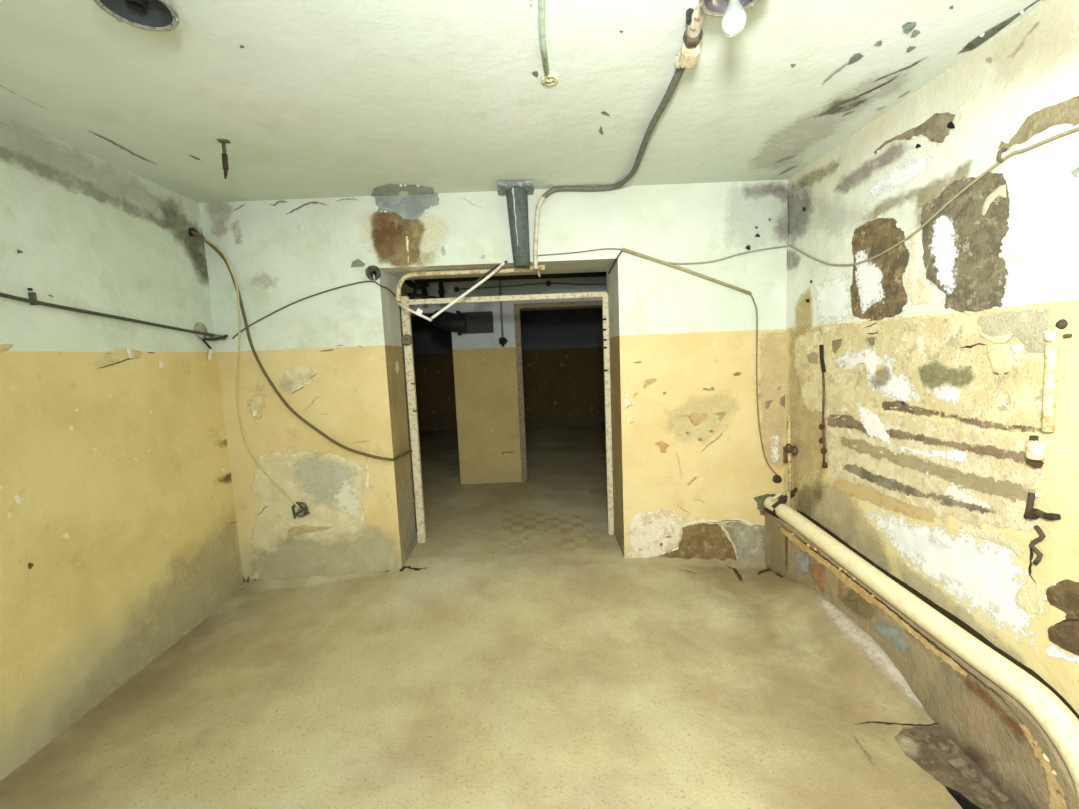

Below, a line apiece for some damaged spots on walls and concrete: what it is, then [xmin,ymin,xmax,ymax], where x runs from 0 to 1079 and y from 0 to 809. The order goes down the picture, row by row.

water stain [759,79,899,166]
flaking render [873,112,956,155]
flaking render [998,94,1079,150]
water stain [0,125,176,227]
flaking render [371,184,439,220]
peeling [754,172,1059,557]
peeling [686,412,727,441]
peeling [249,447,396,580]
flaking render [659,519,765,561]
peeling [778,524,968,679]
flaking render [1015,579,1079,656]
crack [853,721,937,764]